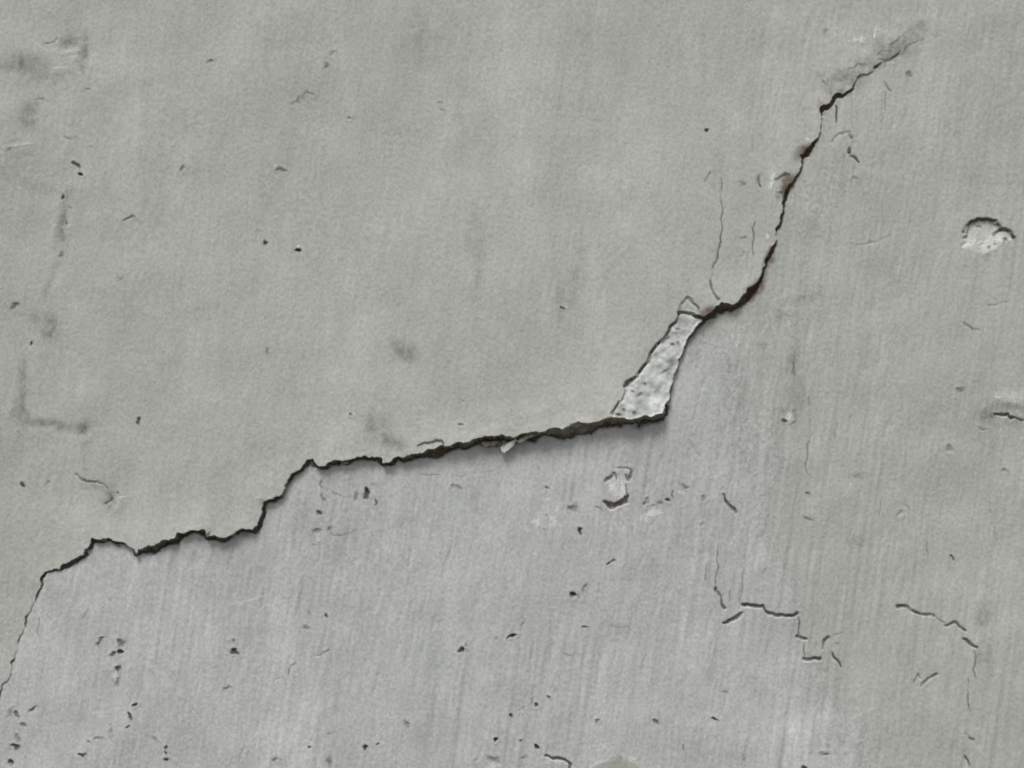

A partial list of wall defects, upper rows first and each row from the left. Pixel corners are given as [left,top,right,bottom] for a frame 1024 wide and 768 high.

crack [691,88,859,336]
spalling [961,218,1015,256]
flaking render [0,133,892,768]
crack [24,405,668,626]
crack [722,604,800,624]
crack [812,636,842,667]
crack [896,605,978,668]